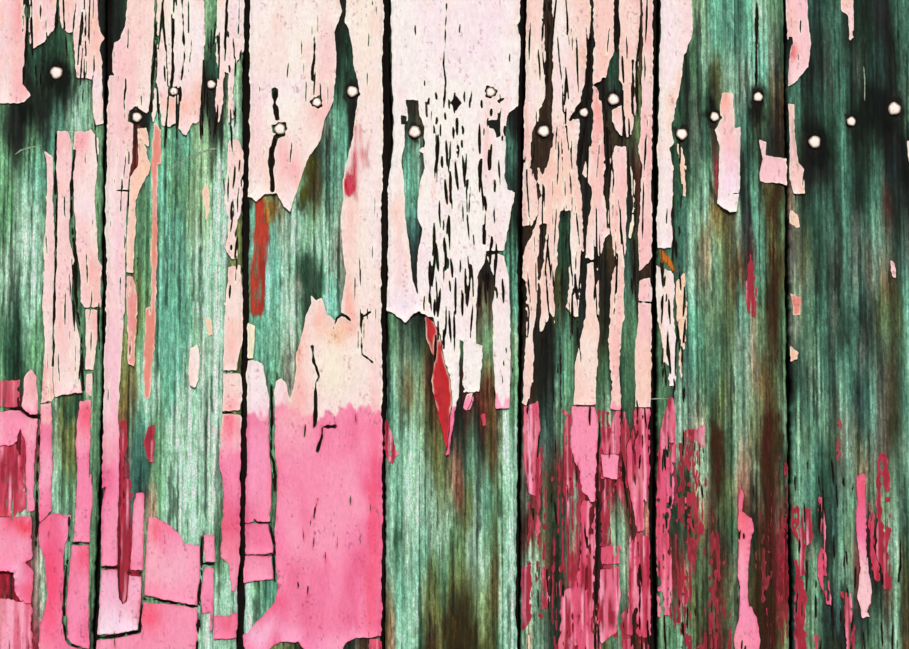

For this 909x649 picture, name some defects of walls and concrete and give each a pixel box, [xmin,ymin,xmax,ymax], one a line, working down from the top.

peeling [786,0,811,86]
peeling [841,0,854,40]
peeling [715,92,741,212]
peeling [759,104,805,194]
peeling [789,210,800,228]
peeling [0,0,693,649]
peeling [745,254,757,317]
peeling [790,294,801,316]
peeling [656,397,731,649]
peeling [728,456,831,649]
peeling [840,452,891,649]